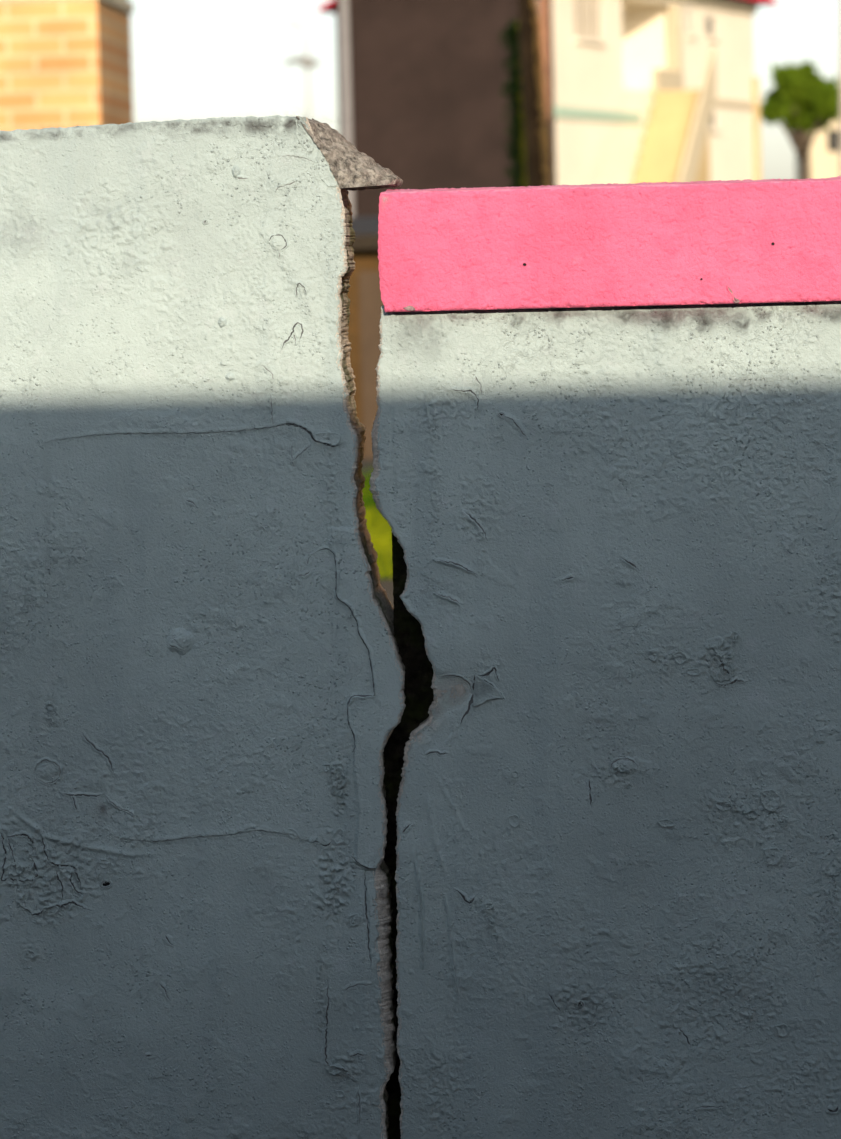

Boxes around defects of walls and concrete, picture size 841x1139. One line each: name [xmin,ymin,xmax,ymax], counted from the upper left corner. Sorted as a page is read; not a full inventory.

crack [42,321,342,466]
spalling [296,116,506,1139]